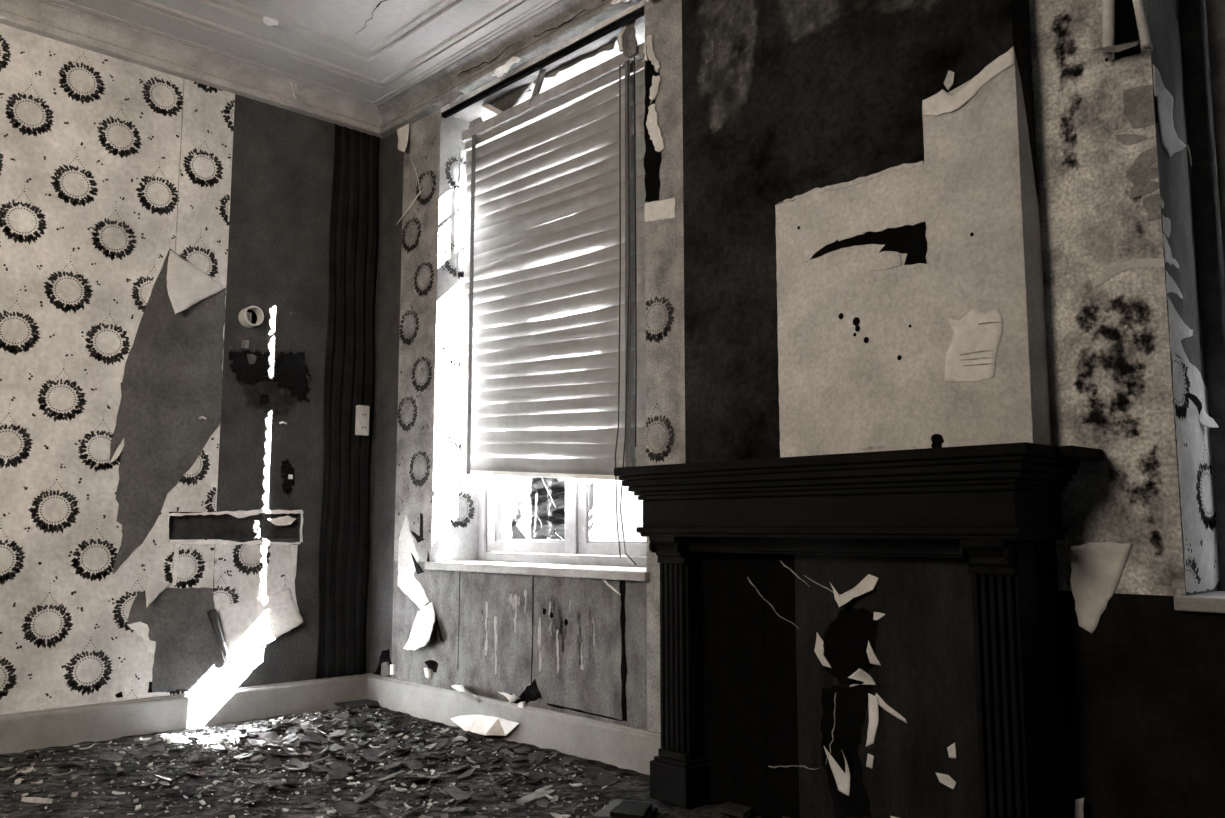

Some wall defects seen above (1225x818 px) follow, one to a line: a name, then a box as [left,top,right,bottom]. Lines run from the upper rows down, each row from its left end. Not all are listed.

water stain [1052,14,1084,90]
water stain [1060,95,1081,168]
peeling [1036,156,1044,222]
flaking render [775,64,1033,457]
water stain [1074,296,1154,437]
flaking render [109,249,303,692]
water stain [1108,446,1161,503]
water stain [1148,518,1162,555]